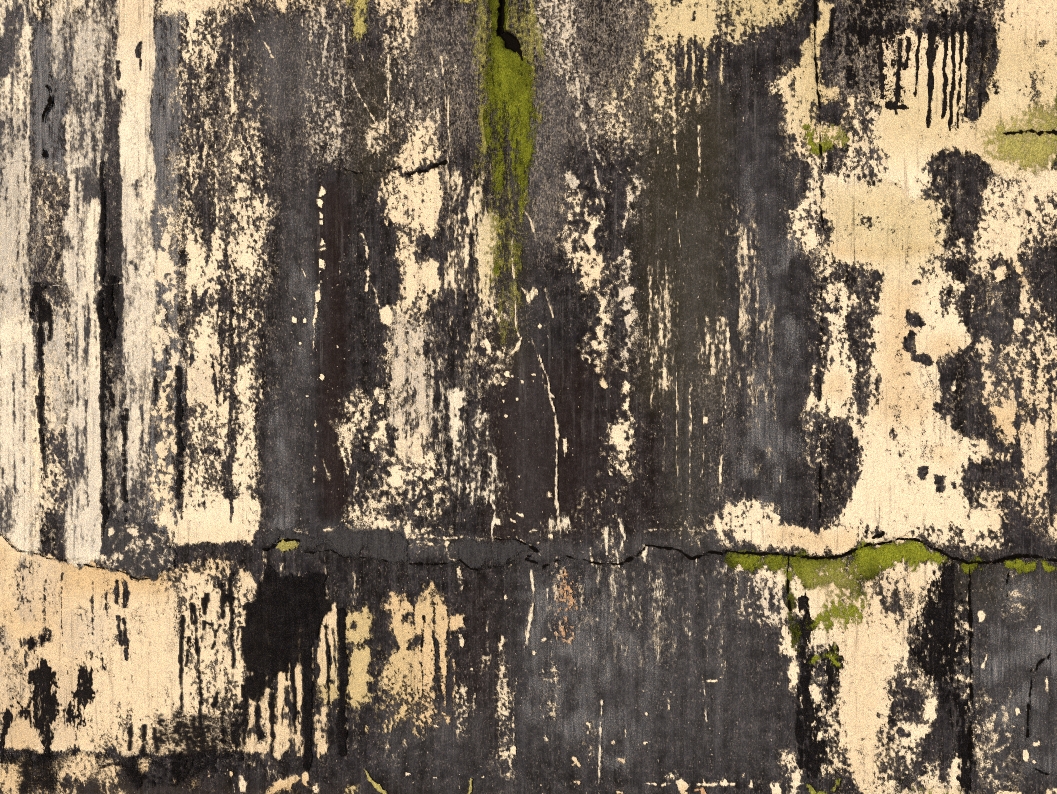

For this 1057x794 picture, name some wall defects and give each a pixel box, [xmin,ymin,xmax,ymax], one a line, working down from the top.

spalling [0,0,536,794]
crack [496,0,523,61]
peeling [526,0,805,483]
crack [813,0,824,241]
peeling [649,0,1057,556]
water stain [827,0,999,131]
crack [1003,128,1057,136]
crack [0,535,149,580]
crack [262,355,1057,794]
water stain [718,552,1057,794]
peeling [887,782,964,794]
peeling [942,594,1040,794]